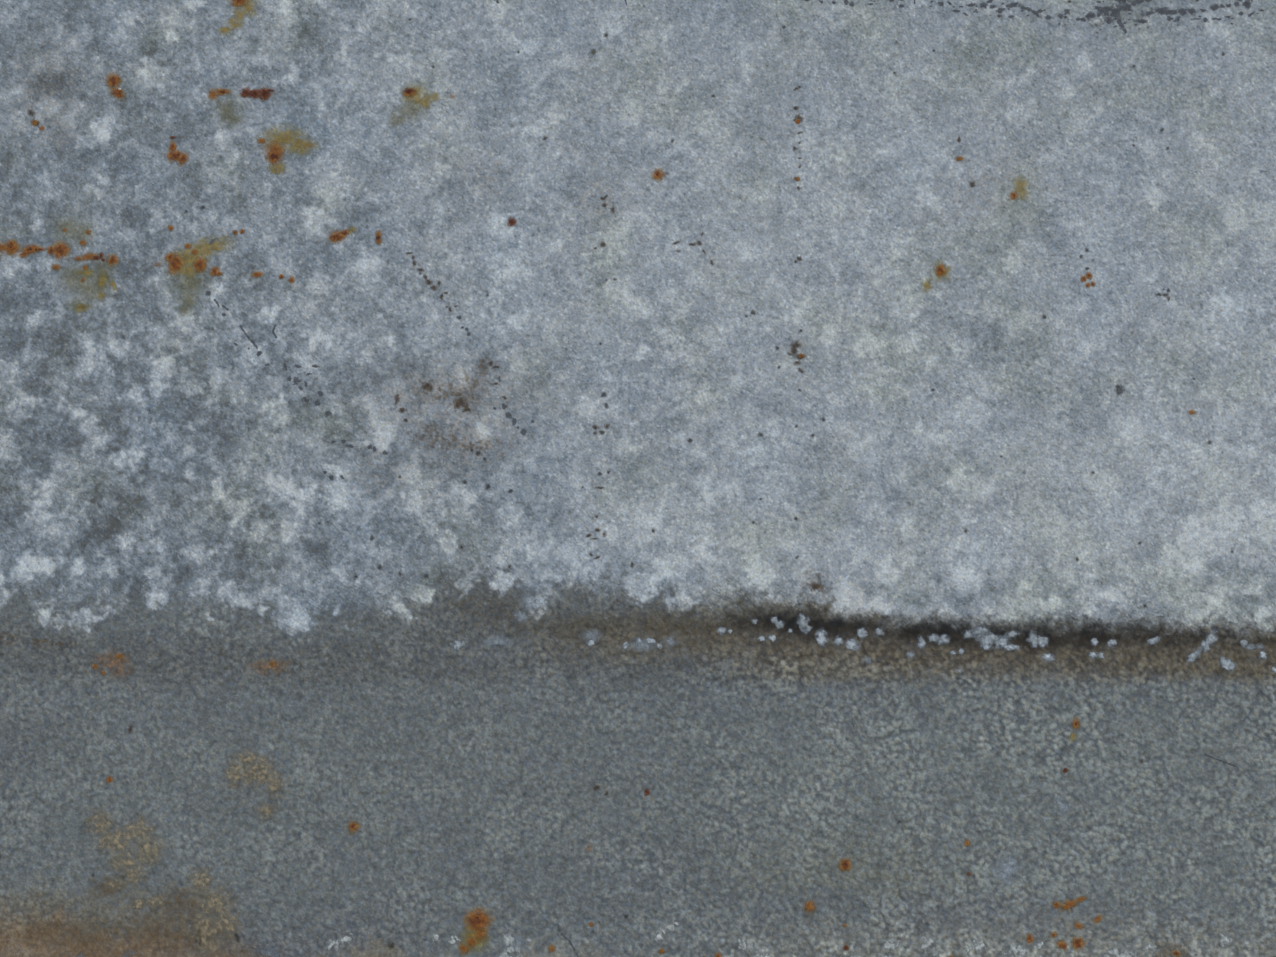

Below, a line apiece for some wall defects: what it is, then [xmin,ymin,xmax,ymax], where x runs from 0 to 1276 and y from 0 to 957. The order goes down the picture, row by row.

rust [220,0,252,32]
rust [208,88,273,121]
rust [394,87,454,123]
rust [258,131,310,174]
rust [0,224,118,311]
rust [156,229,244,304]
rust [1053,896,1085,910]
rust [432,909,490,953]
rust [499,933,531,957]
rust [654,918,679,953]
rust [1004,916,1102,957]
rust [1104,943,1157,957]